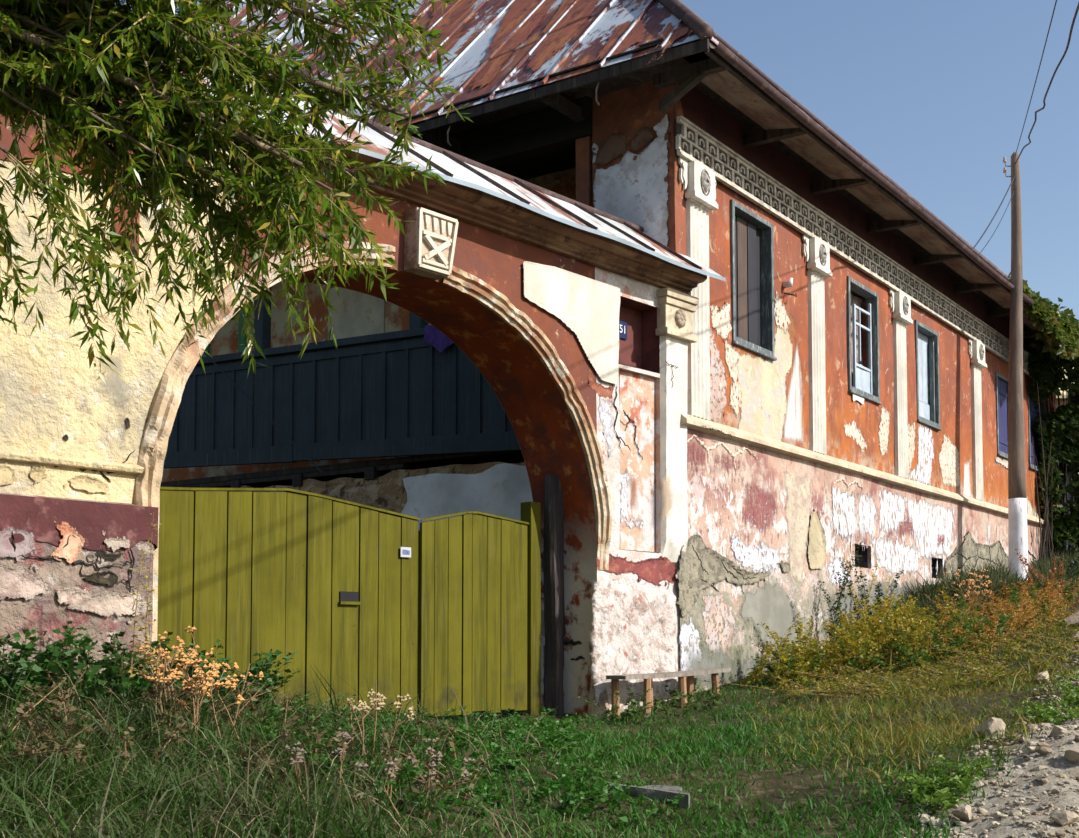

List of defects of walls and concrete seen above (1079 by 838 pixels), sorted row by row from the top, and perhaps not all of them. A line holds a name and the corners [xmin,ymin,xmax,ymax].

corrosion [427,0,476,62]
corrosion [468,0,600,90]
corrosion [596,20,693,68]
peeling [592,114,673,247]
peeling [710,290,793,442]
crack [614,386,643,460]
peeling [0,516,144,624]
spalling [596,469,1008,671]